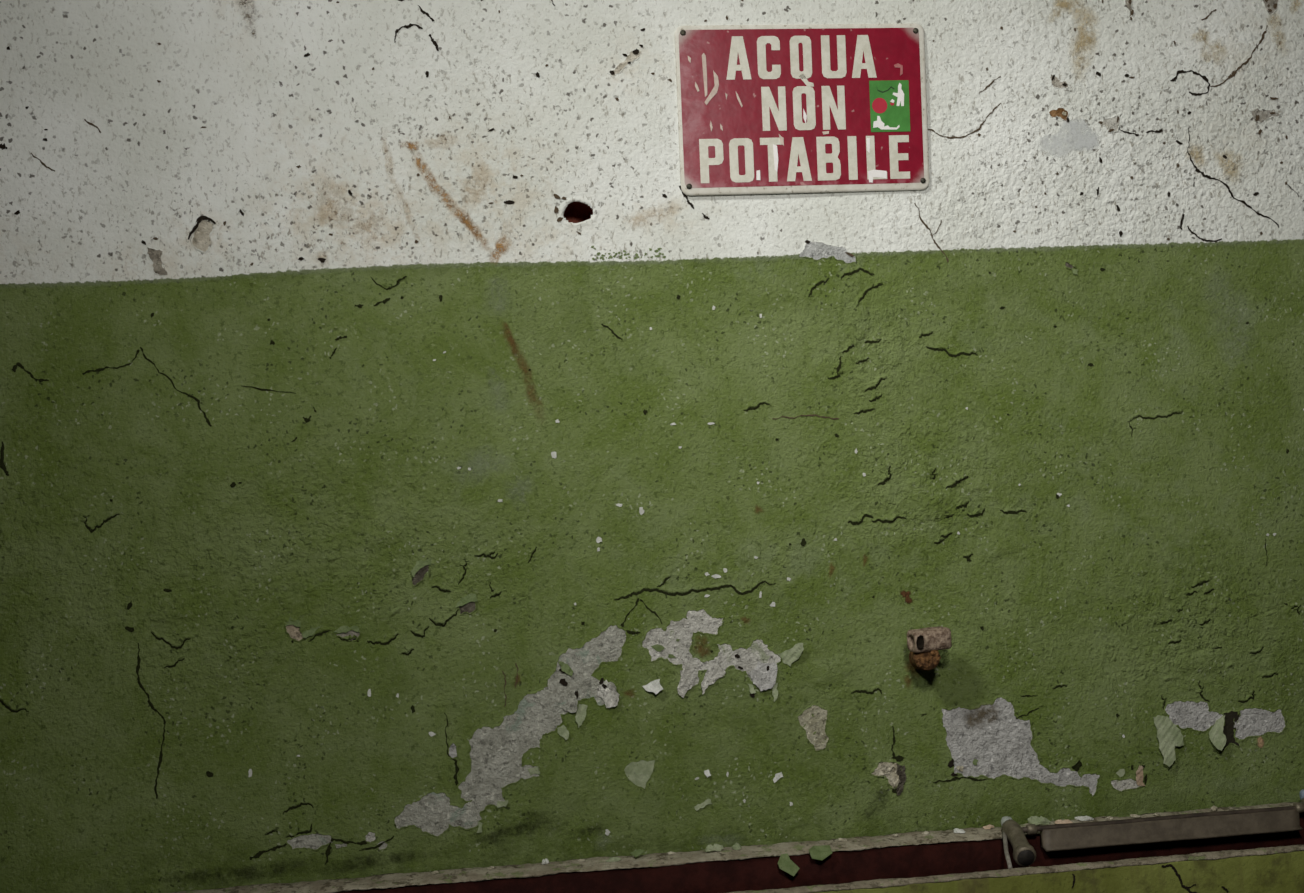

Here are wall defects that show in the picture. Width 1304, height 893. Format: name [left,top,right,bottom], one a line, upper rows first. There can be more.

crack [1170,25,1268,96]
corrosion [406,142,506,259]
crack [1119,128,1279,242]
spalling [797,239,857,265]
crack [743,265,887,420]
crack [847,465,1027,559]
crack [613,574,776,635]
peeling [363,593,804,852]
peeling [796,704,830,752]
peeling [940,696,1147,798]
peeling [1153,699,1287,767]
peeling [285,831,348,852]